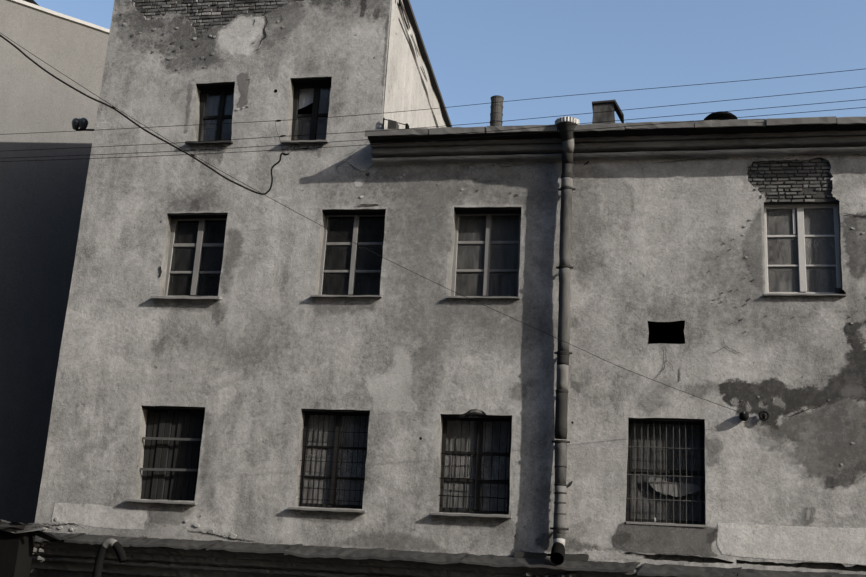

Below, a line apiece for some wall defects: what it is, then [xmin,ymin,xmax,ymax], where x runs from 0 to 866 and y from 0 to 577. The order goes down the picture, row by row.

flaking render [117,0,328,70]
flaking render [722,158,839,292]
flaking render [841,213,866,278]
flaking render [582,522,866,572]